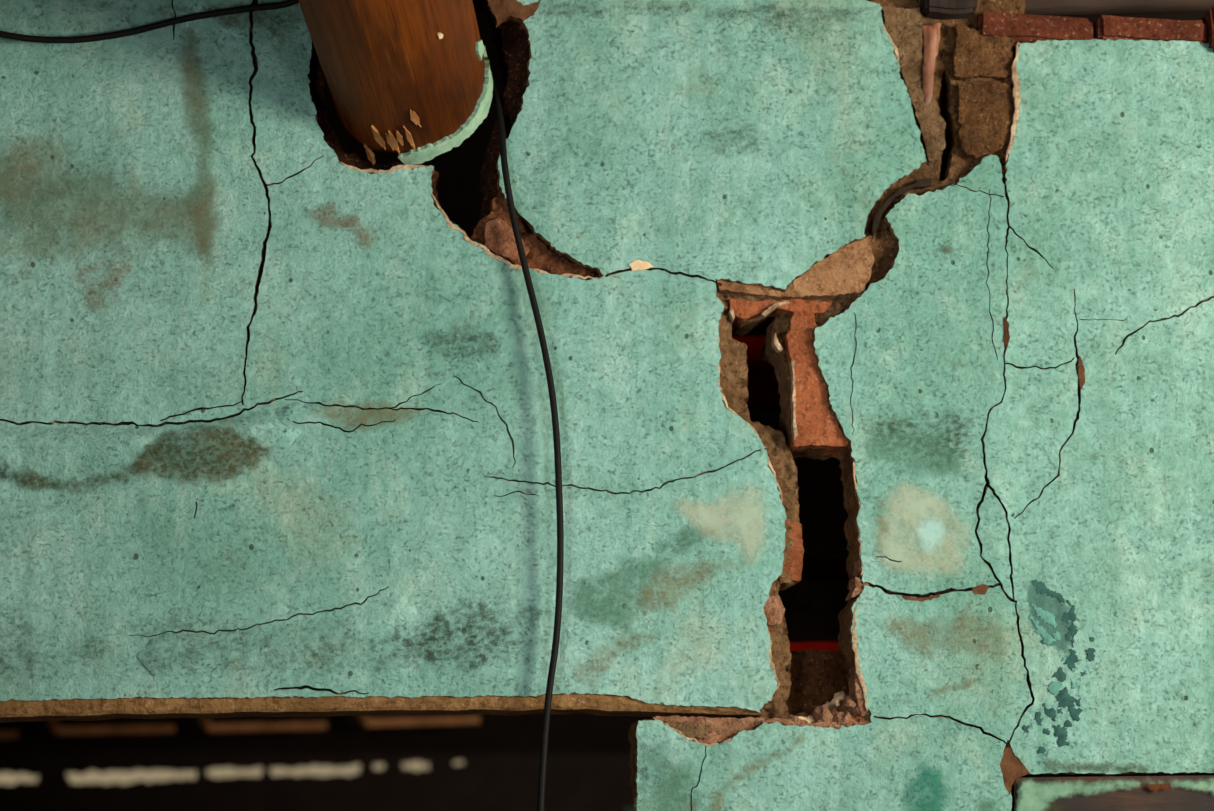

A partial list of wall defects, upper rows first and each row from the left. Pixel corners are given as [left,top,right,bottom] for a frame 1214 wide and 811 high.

crack [0,0,767,497]
spalling [309,0,602,280]
spalling [652,0,1026,747]
crack [849,312,857,431]
crack [864,177,1214,748]
peeling [1023,579,1096,754]
peeling [1000,740,1214,811]